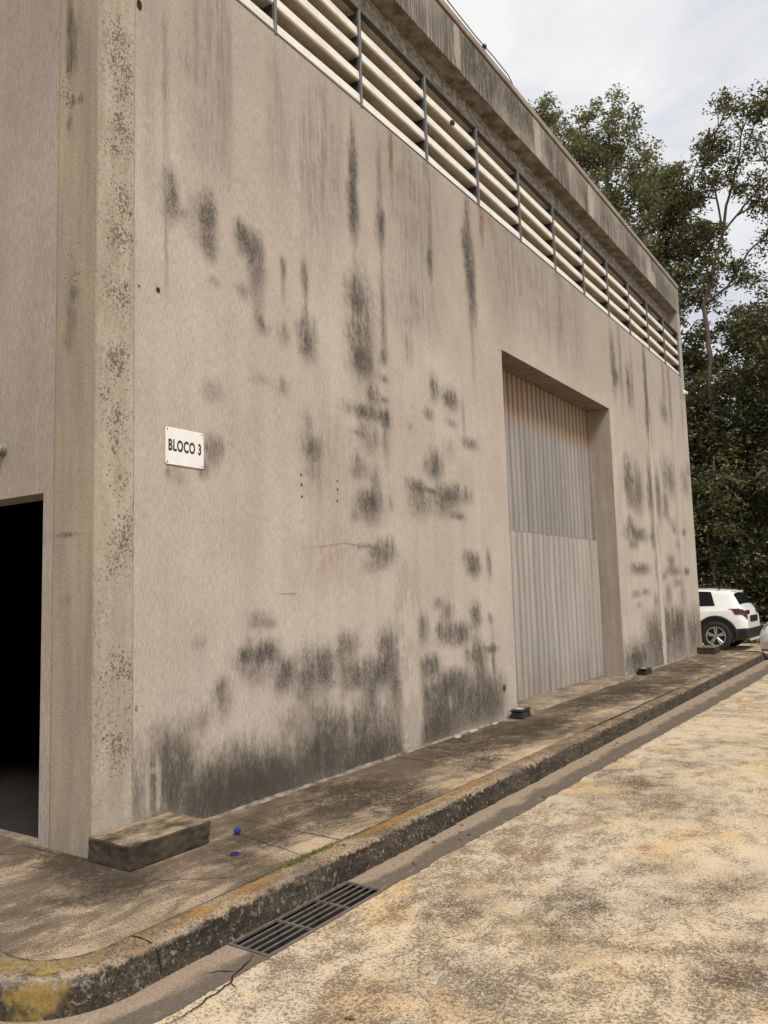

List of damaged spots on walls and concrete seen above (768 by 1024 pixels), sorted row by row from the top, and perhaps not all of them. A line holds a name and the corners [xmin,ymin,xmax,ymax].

leakage [349,149,357,226]
leakage [237,221,262,281]
leakage [462,215,474,309]
leakage [300,322,312,354]
leakage [349,277,371,371]
leakage [354,388,389,438]
leakage [624,355,700,667]
leakage [145,569,496,815]
crack [166,956,252,1024]